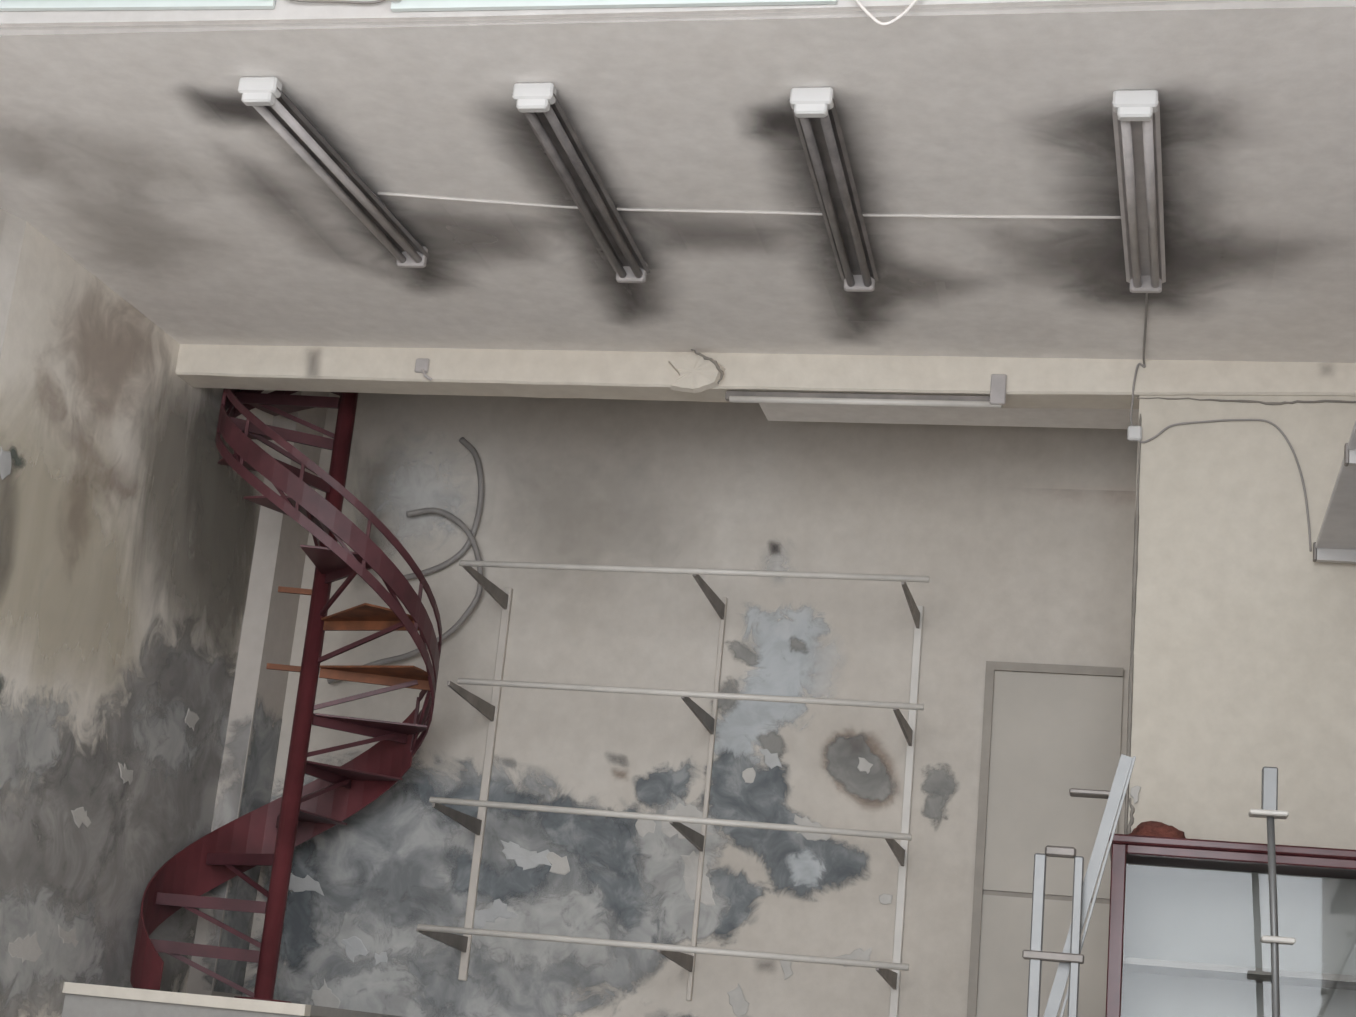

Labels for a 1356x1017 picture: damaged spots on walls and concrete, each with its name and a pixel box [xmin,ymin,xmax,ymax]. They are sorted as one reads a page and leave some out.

crack [691,349,724,384]
water stain [0,475,12,583]
water stain [192,430,248,605]
spalling [612,607,868,944]
spalling [826,734,893,804]
spalling [922,765,956,823]
peeling [289,873,324,896]
peeling [501,840,570,875]
peeling [0,886,107,1006]
peeling [300,913,446,1017]
peeling [456,885,627,972]